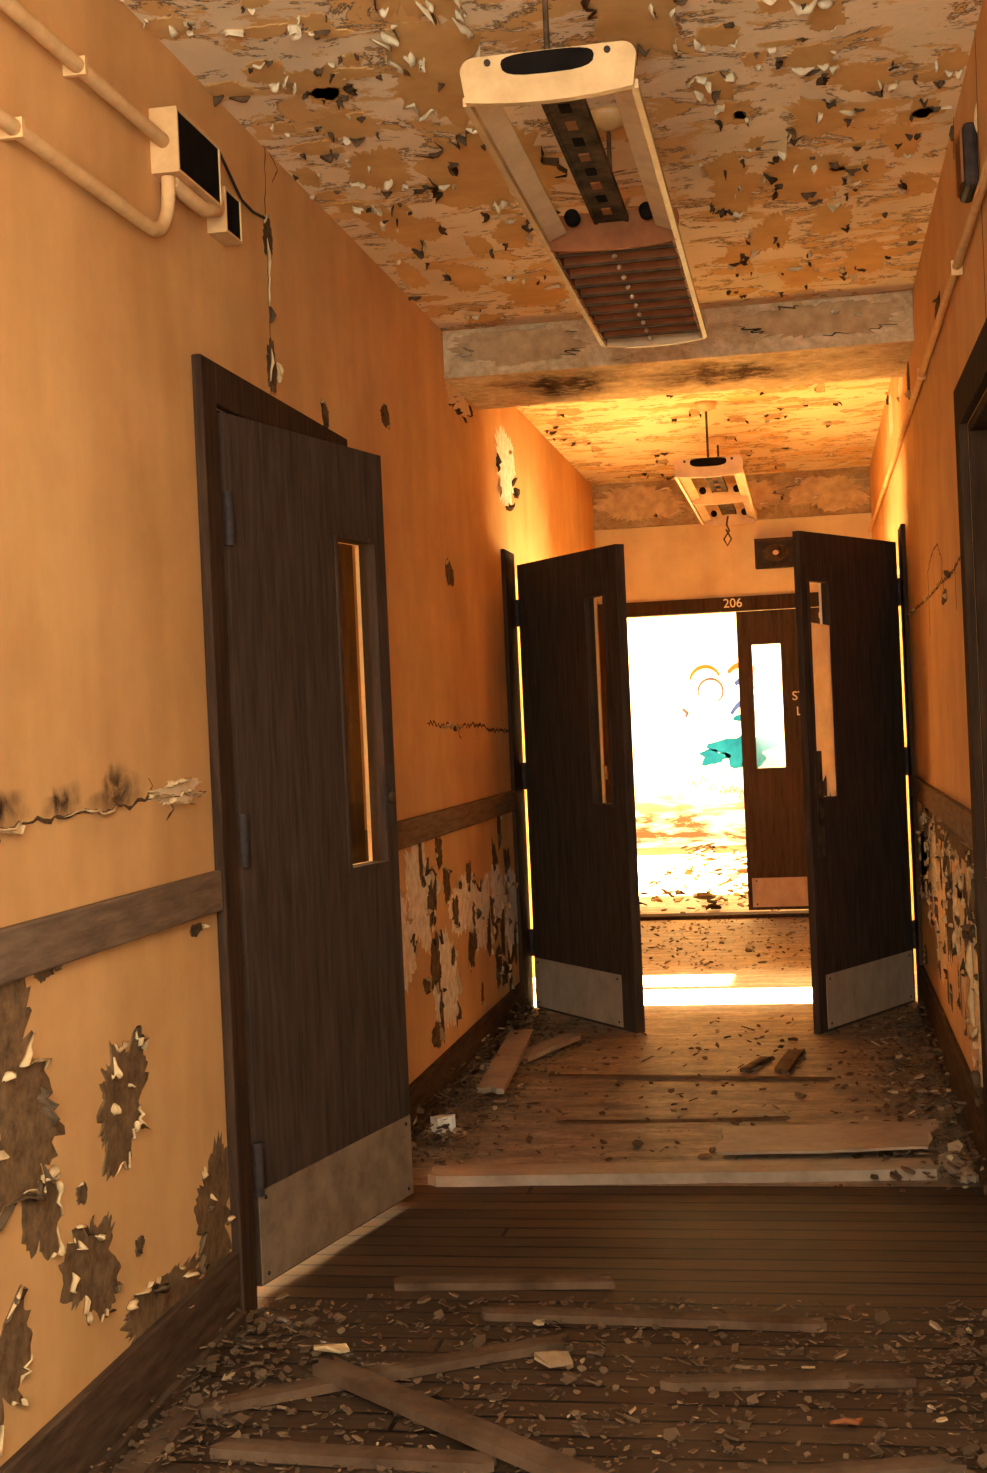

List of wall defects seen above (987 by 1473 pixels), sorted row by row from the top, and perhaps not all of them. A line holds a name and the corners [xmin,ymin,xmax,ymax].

peeling [580,0,969,339]
peeling [266,338,284,395]
crack [905,544,960,620]
spalling [914,805,987,1108]
spalling [0,965,236,1344]
peeling [0,1284,33,1457]